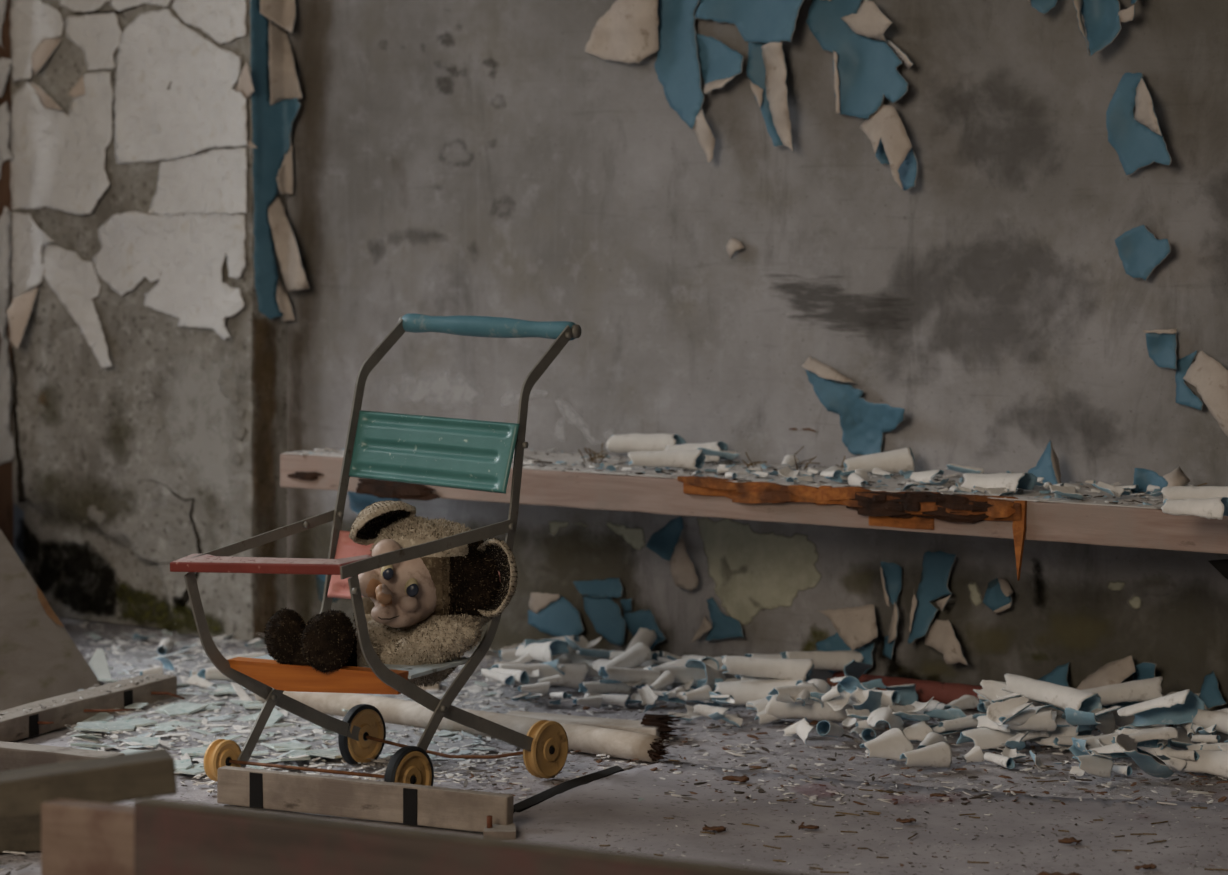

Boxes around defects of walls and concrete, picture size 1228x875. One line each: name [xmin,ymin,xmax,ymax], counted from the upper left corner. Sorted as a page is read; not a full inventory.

peeling [1028,0,1057,14]
peeling [1073,0,1137,57]
peeling [584,0,918,191]
peeling [1106,72,1172,175]
peeling [0,0,310,465]
peeling [1115,225,1171,281]
peeling [801,356,1044,496]
peeling [1143,329,1228,437]
crack [140,480,202,606]
peeling [1055,481,1228,520]
flaking render [474,516,1228,779]